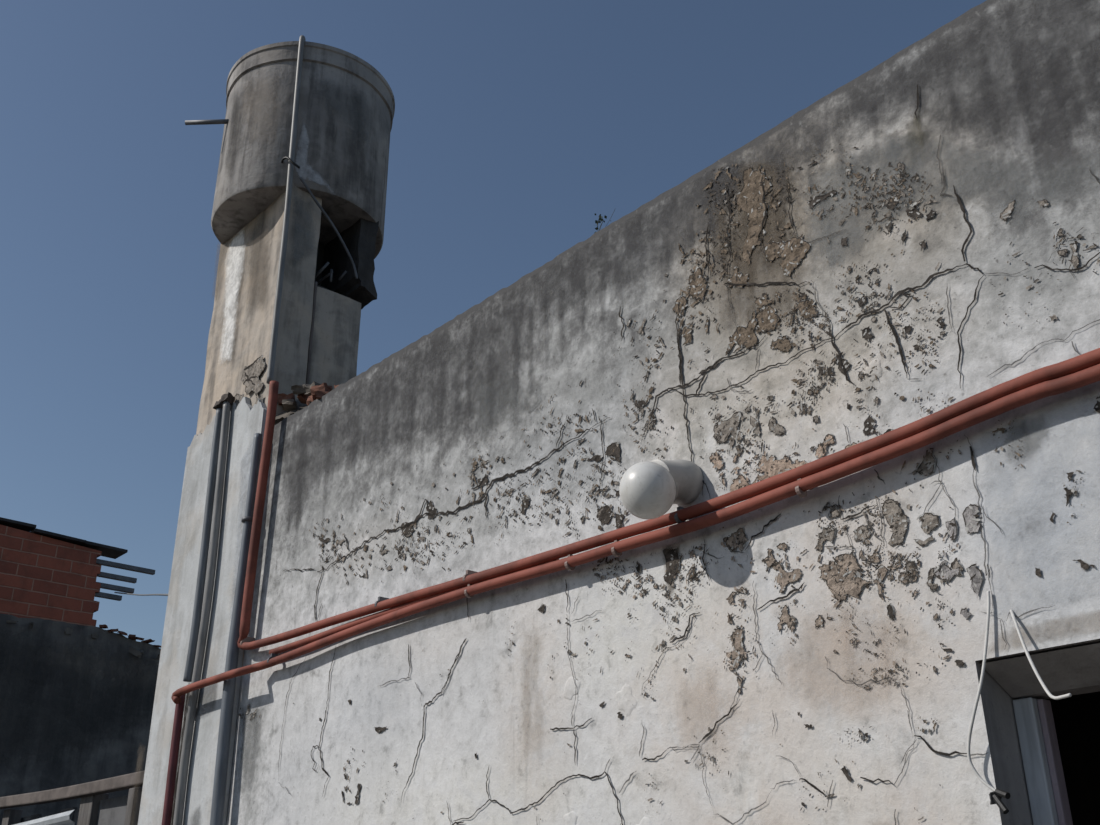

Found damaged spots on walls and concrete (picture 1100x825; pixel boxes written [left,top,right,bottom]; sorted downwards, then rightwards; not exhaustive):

damp [295,125,325,184]
spalling [275,381,338,420]
crack [283,409,610,619]
peeling [309,144,953,584]
peeling [592,440,984,700]
crack [650,135,1100,496]
crack [921,437,1052,650]
peeling [1063,470,1082,523]
peeling [341,748,368,805]
crack [380,597,469,800]
crack [447,579,833,825]
crack [825,657,989,825]